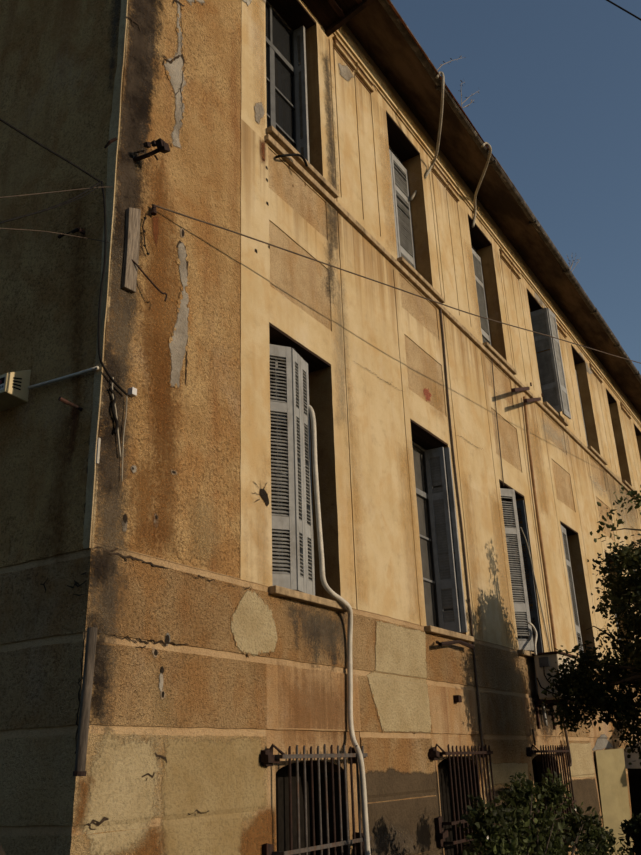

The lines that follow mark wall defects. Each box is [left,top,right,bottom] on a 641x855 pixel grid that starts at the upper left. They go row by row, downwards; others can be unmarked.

peeling [164,0,206,147]
damp [324,57,336,189]
damp [85,0,163,729]
peeling [168,228,191,388]
damp [326,202,338,295]
damp [289,605,347,666]